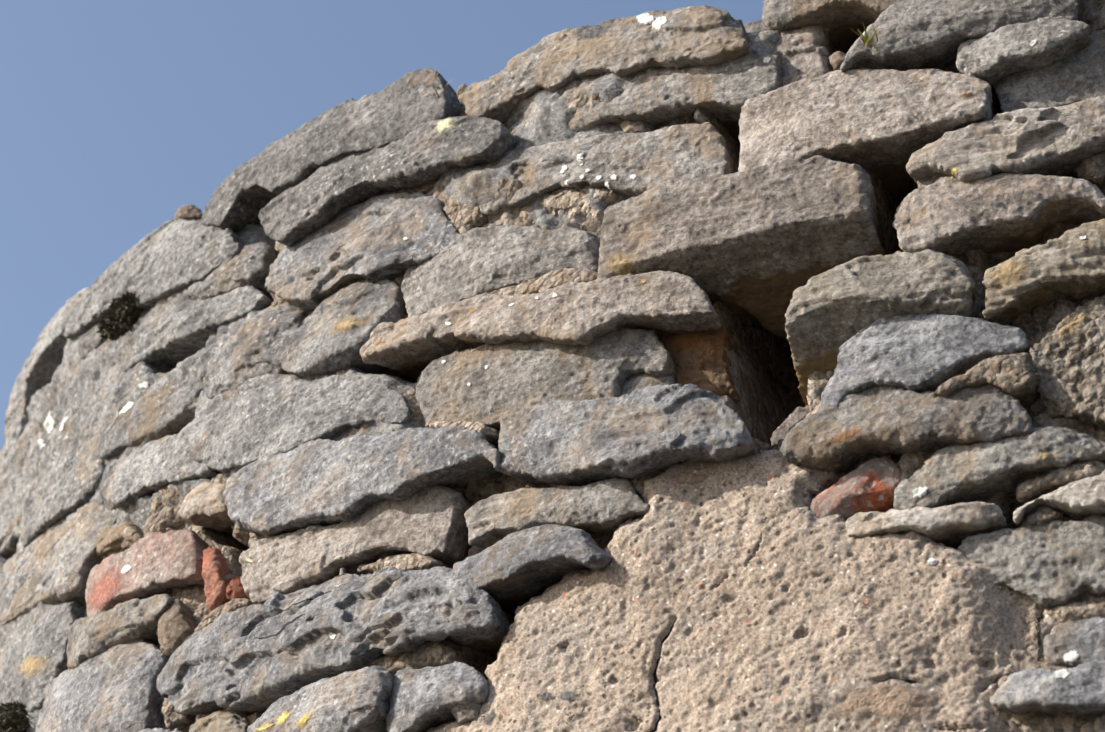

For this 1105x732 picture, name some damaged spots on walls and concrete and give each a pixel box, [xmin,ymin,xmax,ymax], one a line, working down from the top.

crack [650,620,676,732]